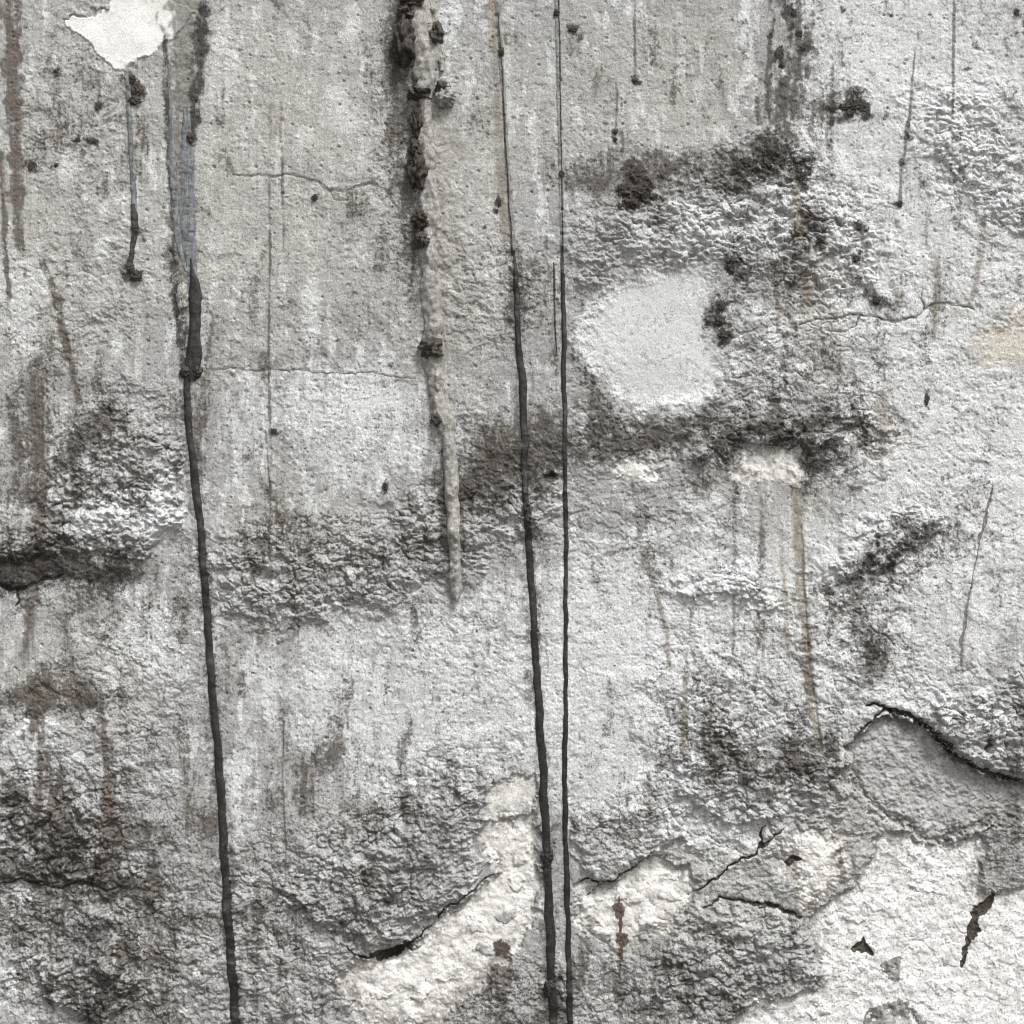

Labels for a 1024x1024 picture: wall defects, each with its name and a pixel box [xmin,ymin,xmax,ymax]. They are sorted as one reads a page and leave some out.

peeling [62,0,190,71]
mould [614,157,658,212]
peeling [568,257,729,423]
mould [701,291,735,352]
leakage [863,287,890,310]
mould [697,412,874,496]
crack [854,702,1024,782]
crack [346,874,495,959]
spalling [335,773,544,1024]
corrosion [612,896,631,960]
crack [688,825,802,919]
spalling [726,711,1024,1024]